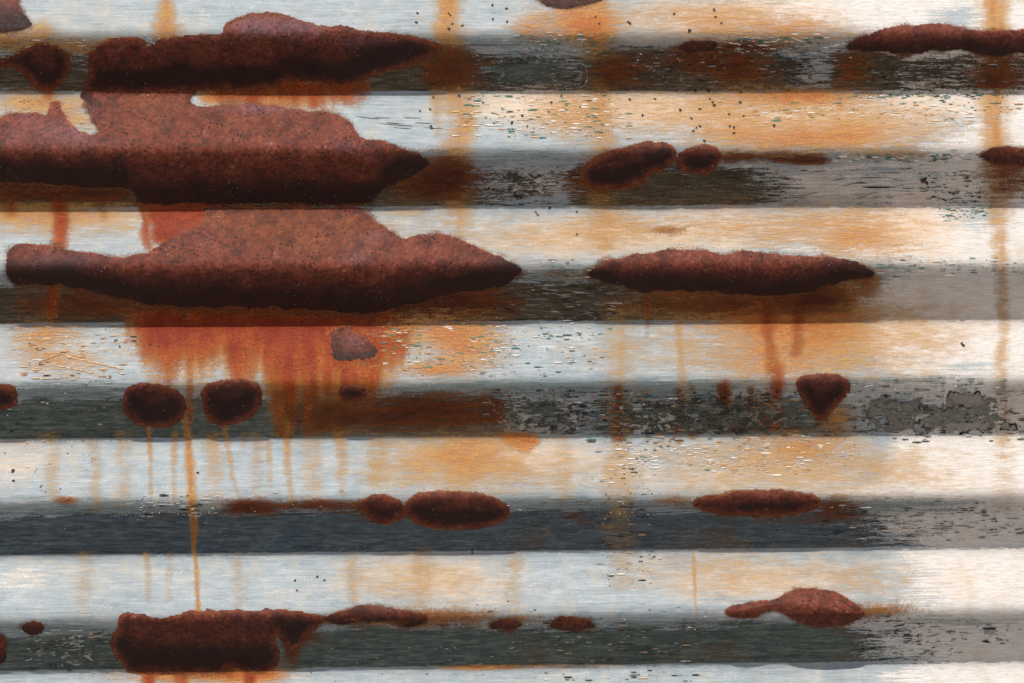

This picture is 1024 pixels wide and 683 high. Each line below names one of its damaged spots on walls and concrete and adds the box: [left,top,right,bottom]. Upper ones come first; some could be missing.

corrosion [0,0,596,683]
corrosion [502,0,1024,523]